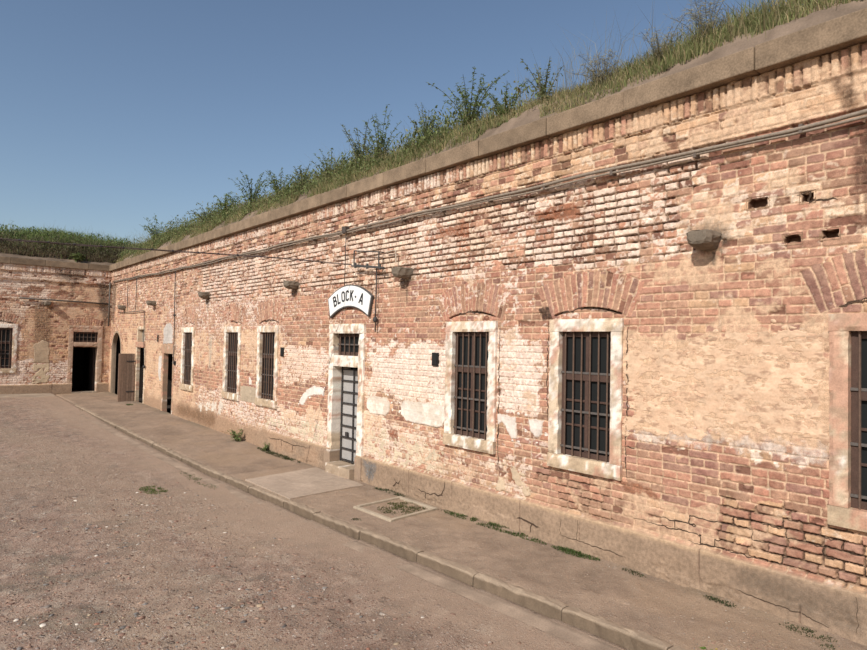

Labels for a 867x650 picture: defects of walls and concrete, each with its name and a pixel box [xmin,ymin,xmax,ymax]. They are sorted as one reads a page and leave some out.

peeling [195,396,224,415]
peeling [365,429,446,474]
spalling [619,481,658,499]
crack [635,515,867,577]
crack [739,590,827,627]